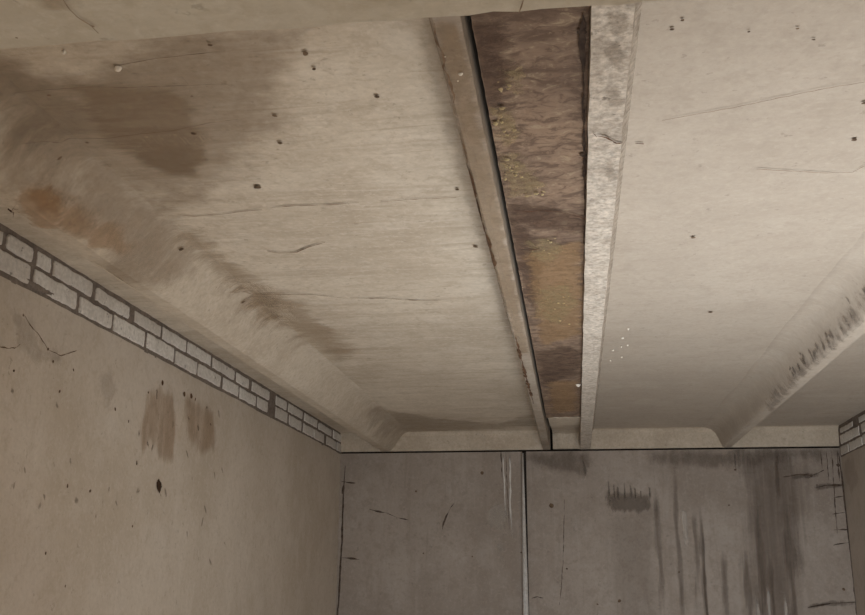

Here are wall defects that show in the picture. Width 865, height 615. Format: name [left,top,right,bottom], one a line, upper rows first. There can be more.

crack [516,14,644,280]